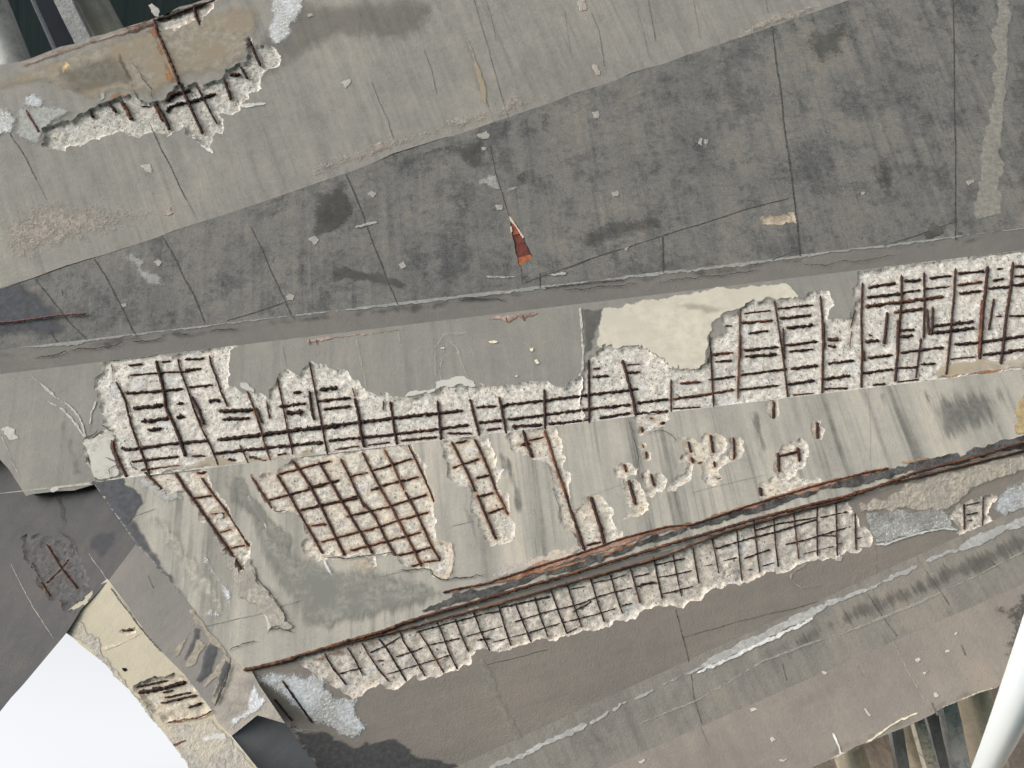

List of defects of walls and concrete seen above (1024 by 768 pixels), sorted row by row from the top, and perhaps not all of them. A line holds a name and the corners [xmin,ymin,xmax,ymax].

spalling [148,0,217,31]
spalling [41,36,281,151]
crack [38,334,187,358]
spalling [82,250,1024,630]
corrosion [706,468,886,519]
spalling [19,533,93,615]
corrosion [450,522,692,593]
spalling [297,456,1024,699]
spalling [130,672,211,724]